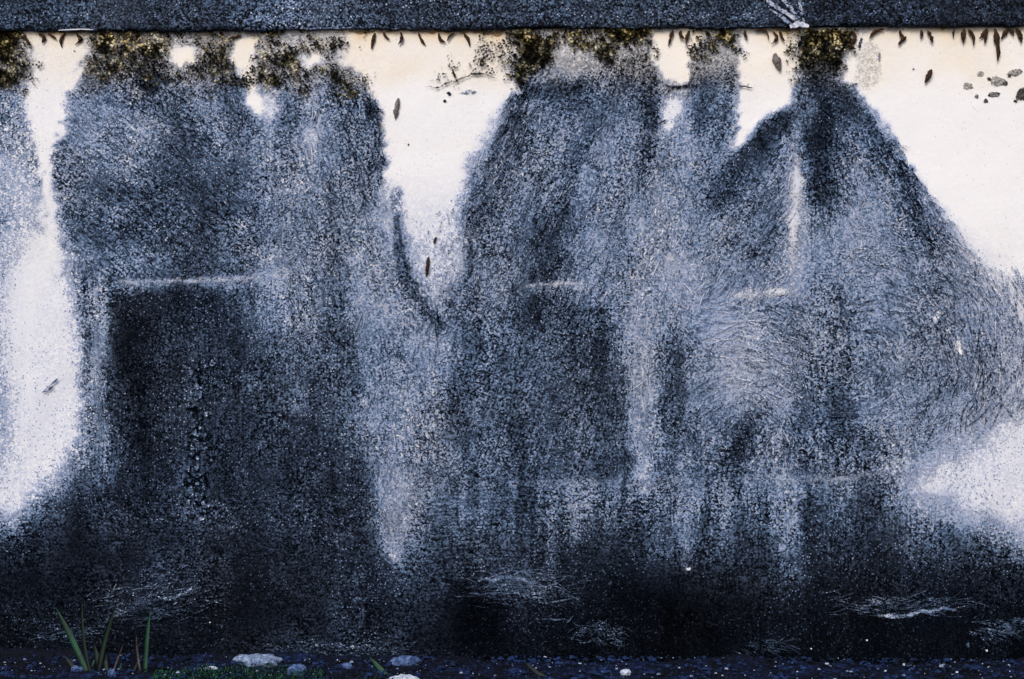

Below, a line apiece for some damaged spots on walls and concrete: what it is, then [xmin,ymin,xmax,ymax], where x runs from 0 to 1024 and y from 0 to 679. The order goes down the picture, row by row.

water stain [766,0,909,56]
water stain [858,38,880,85]
water stain [0,40,46,489]